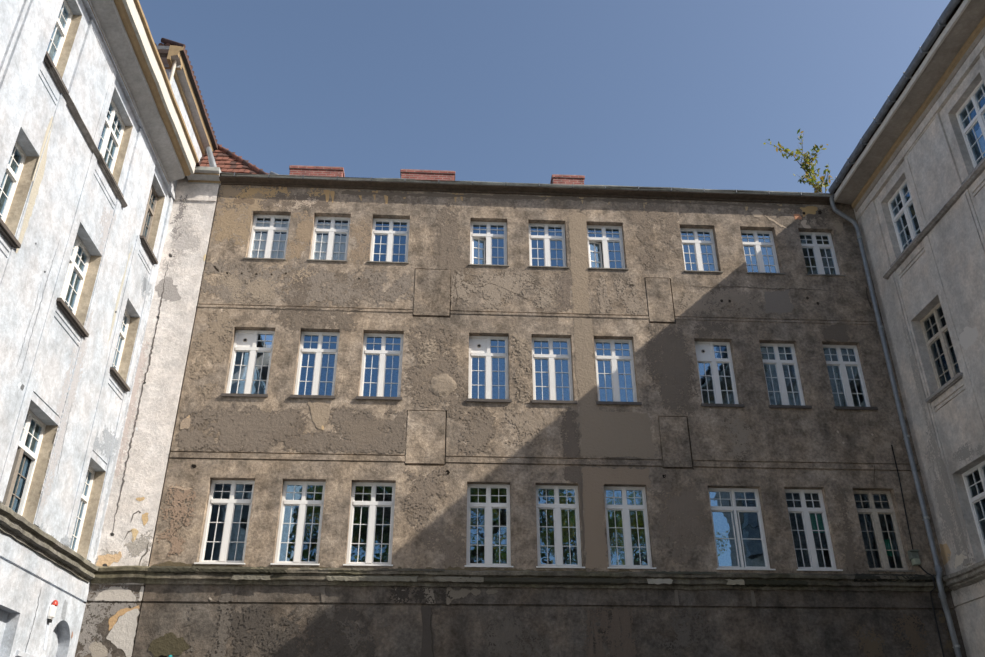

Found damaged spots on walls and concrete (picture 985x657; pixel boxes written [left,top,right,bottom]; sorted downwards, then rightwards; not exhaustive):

crack [112,264,190,565]
spalling [95,513,154,566]
peeling [89,586,144,657]